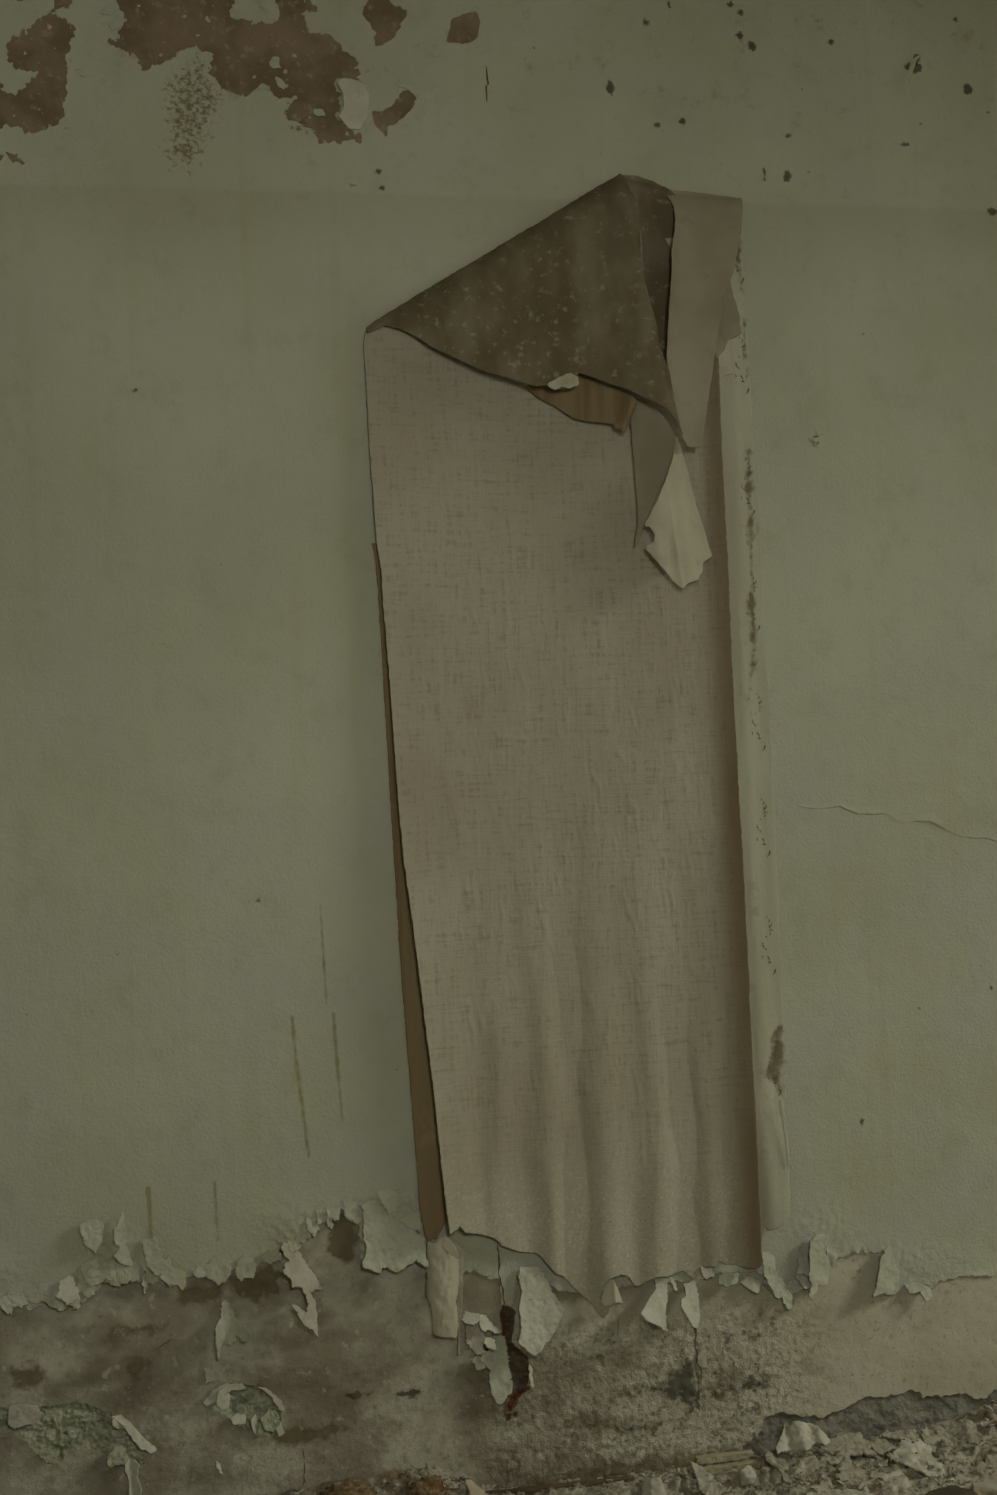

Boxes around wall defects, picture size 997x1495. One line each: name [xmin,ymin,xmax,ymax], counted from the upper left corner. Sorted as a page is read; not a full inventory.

peeling [0,0,89,133]
peeling [100,0,442,144]
flaking render [0,1187,997,1495]